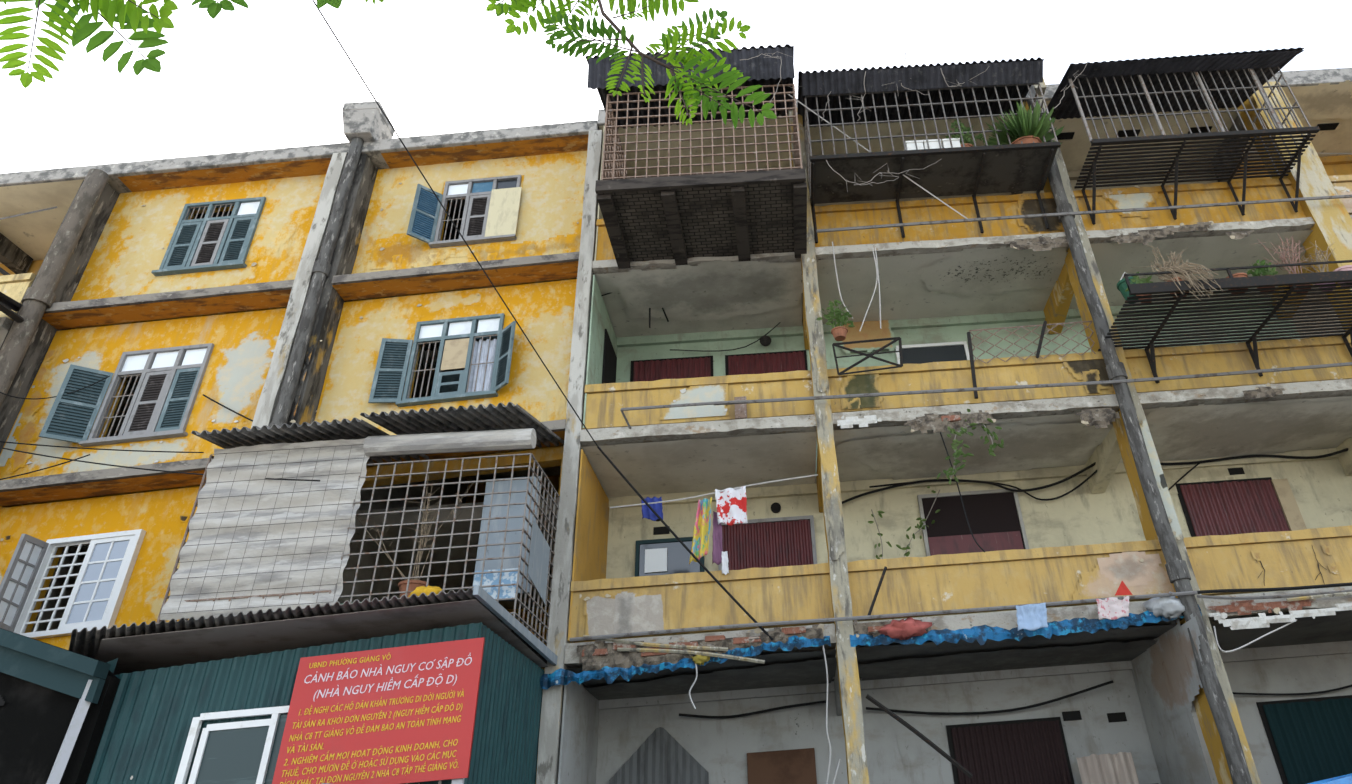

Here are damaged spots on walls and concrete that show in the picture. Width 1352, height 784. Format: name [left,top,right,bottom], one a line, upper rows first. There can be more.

peeling [0,329,280,477]
peeling [660,384,729,420]
spalling [1207,599,1352,630]
spalling [577,624,825,671]